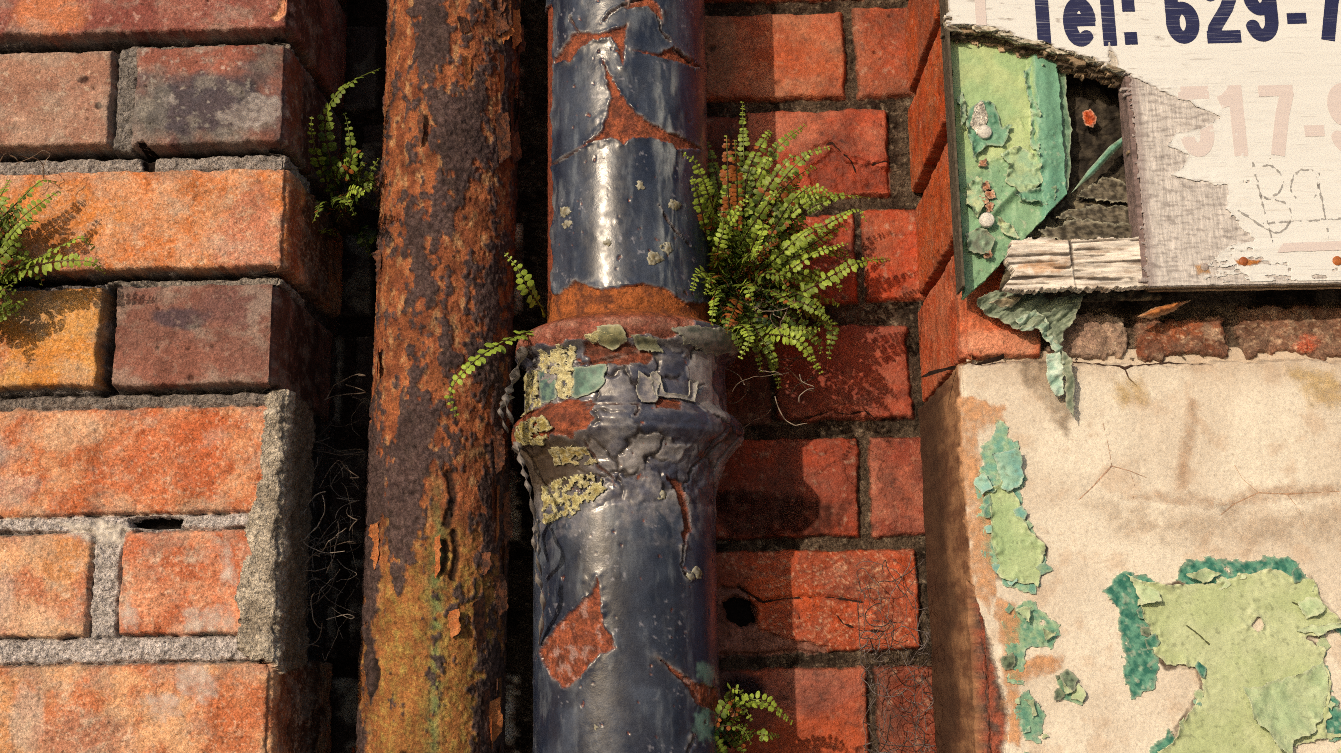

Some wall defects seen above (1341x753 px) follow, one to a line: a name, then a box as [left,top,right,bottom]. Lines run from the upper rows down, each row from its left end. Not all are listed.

peeling [555,26,702,150]
peeling [957,62,1044,192]
peeling [965,176,1020,255]
peeling [636,371,699,410]
peeling [976,290,1086,417]
crack [1073,361,1205,385]
crack [1078,424,1145,500]
crack [1221,465,1340,527]
peeling [539,581,616,688]
crack [737,586,884,652]
peeling [968,418,1086,753]
peeling [1102,555,1341,753]